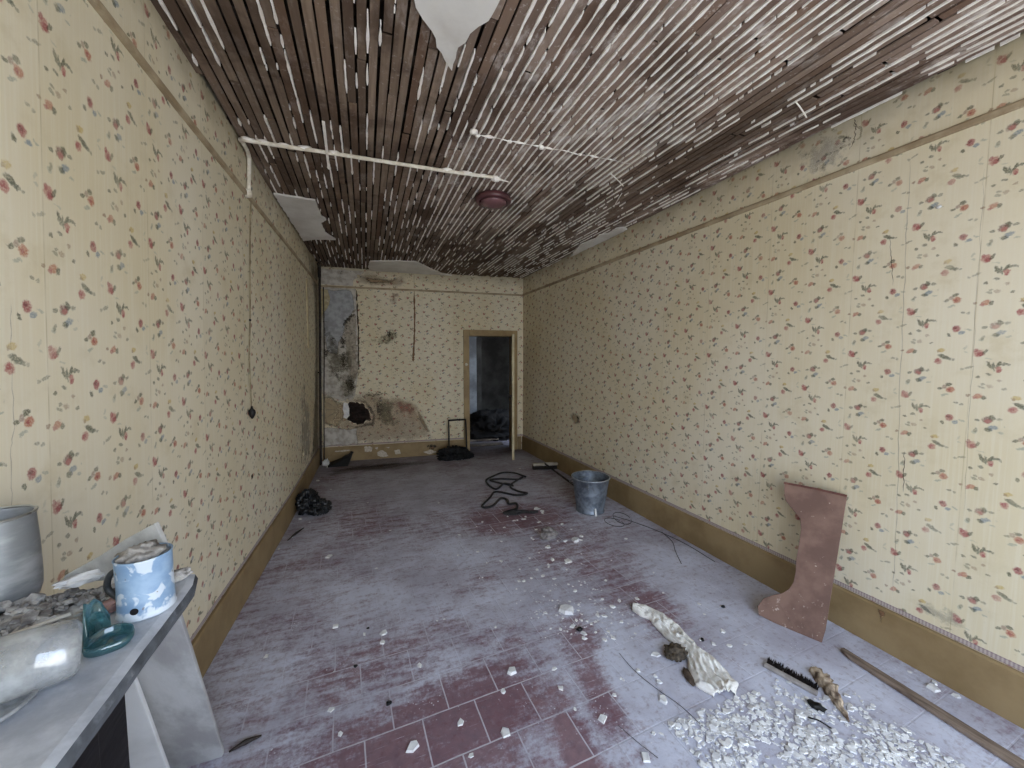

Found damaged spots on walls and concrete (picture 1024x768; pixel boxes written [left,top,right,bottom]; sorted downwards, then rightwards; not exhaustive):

spalling [414,0,500,70]
flaking render [322,121,331,170]
spalling [274,193,336,241]
spalling [570,226,627,257]
spalling [368,260,452,276]
flaking render [324,290,354,352]
leakage [311,266,355,453]
spalling [343,399,374,428]